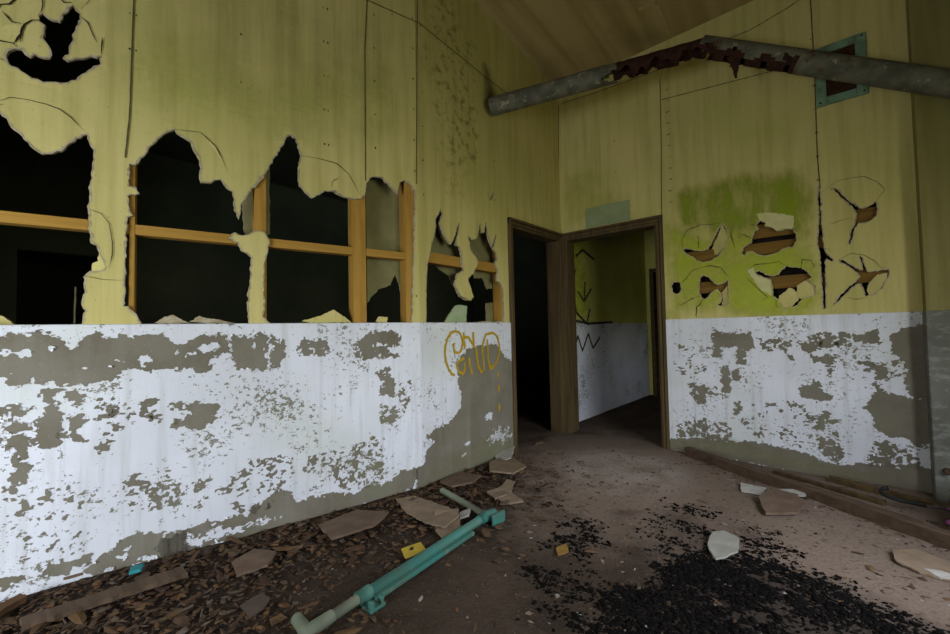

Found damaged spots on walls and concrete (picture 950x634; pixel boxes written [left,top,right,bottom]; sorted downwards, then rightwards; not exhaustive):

spalling [670,176,890,314]
peeling [0,97,514,580]
peeling [670,324,932,493]
peeling [0,575,26,592]